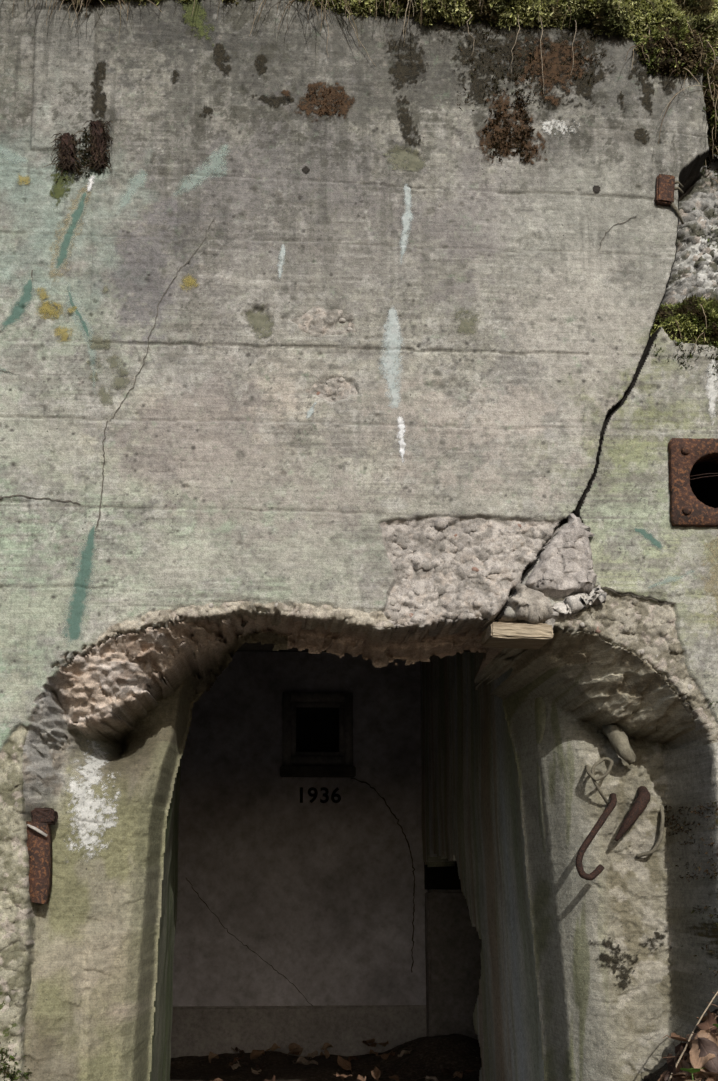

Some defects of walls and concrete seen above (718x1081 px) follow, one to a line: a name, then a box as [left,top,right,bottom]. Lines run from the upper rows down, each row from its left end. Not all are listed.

damp [61,0,93,18]
damp [90,62,107,123]
damp [436,22,614,164]
damp [634,127,650,144]
damp [628,47,677,115]
damp [401,184,413,256]
spalling [661,135,718,306]
damp [379,308,406,462]
crack [494,151,709,622]
spalling [83,516,562,655]
spalling [554,591,718,747]
spalling [0,726,35,1081]